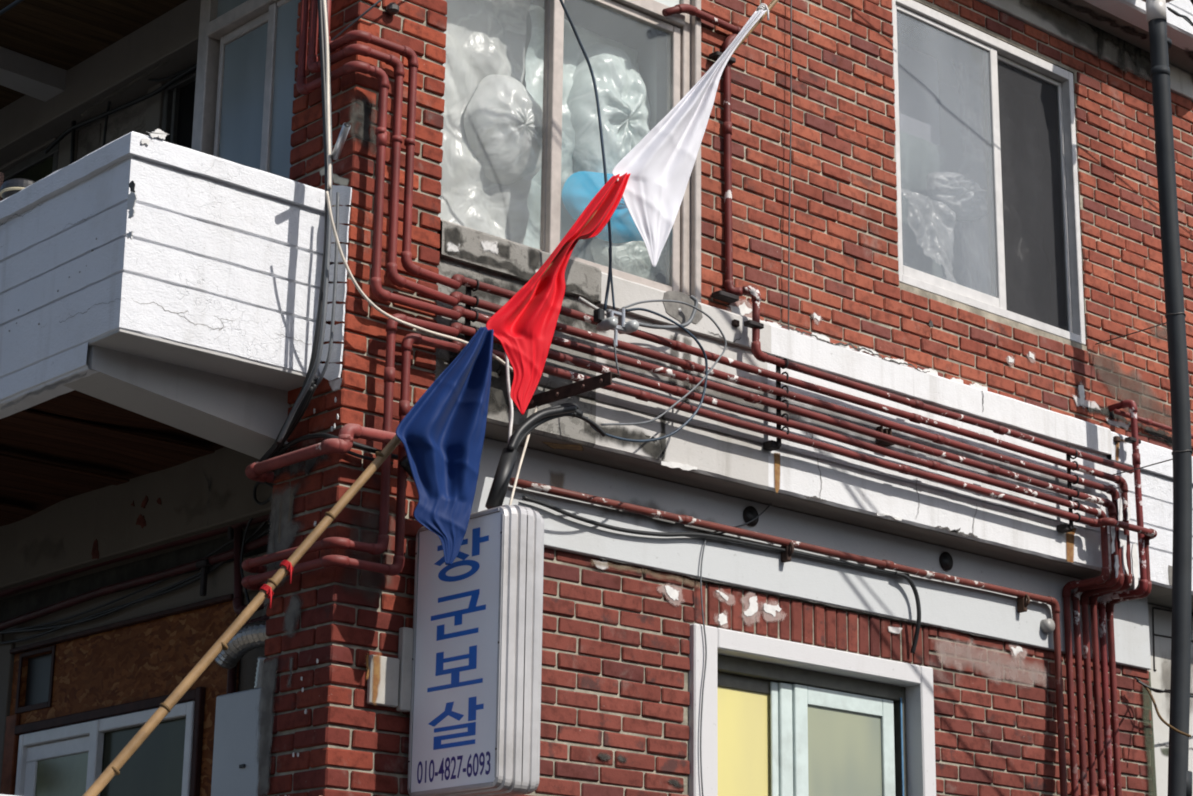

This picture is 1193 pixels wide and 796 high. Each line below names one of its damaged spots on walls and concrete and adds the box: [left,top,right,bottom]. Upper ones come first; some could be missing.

crack [59,298,240,330]